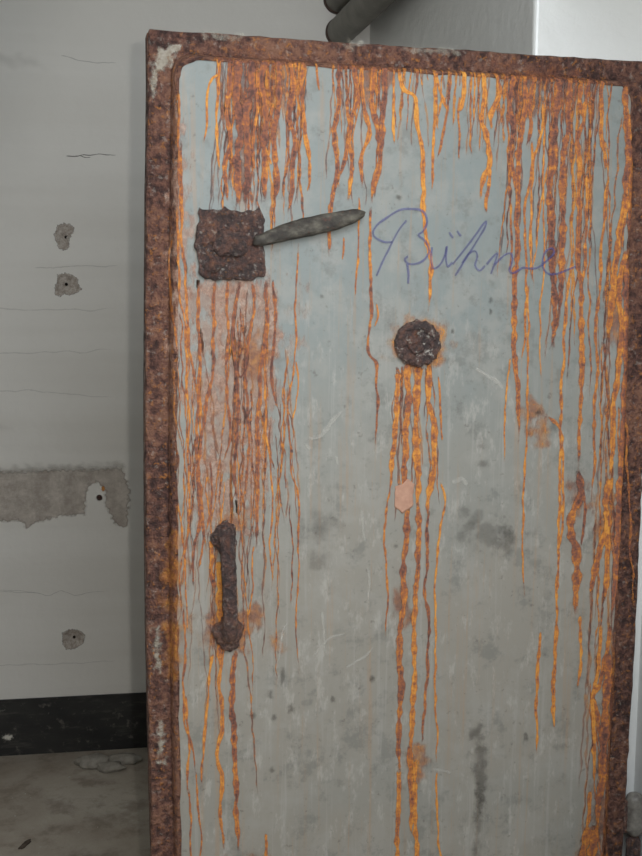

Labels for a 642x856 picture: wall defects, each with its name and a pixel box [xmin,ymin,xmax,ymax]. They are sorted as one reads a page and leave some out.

peeling [0,468,130,528]
corrosion [168,93,300,856]
corrosion [204,58,320,229]
corrosion [328,64,635,856]